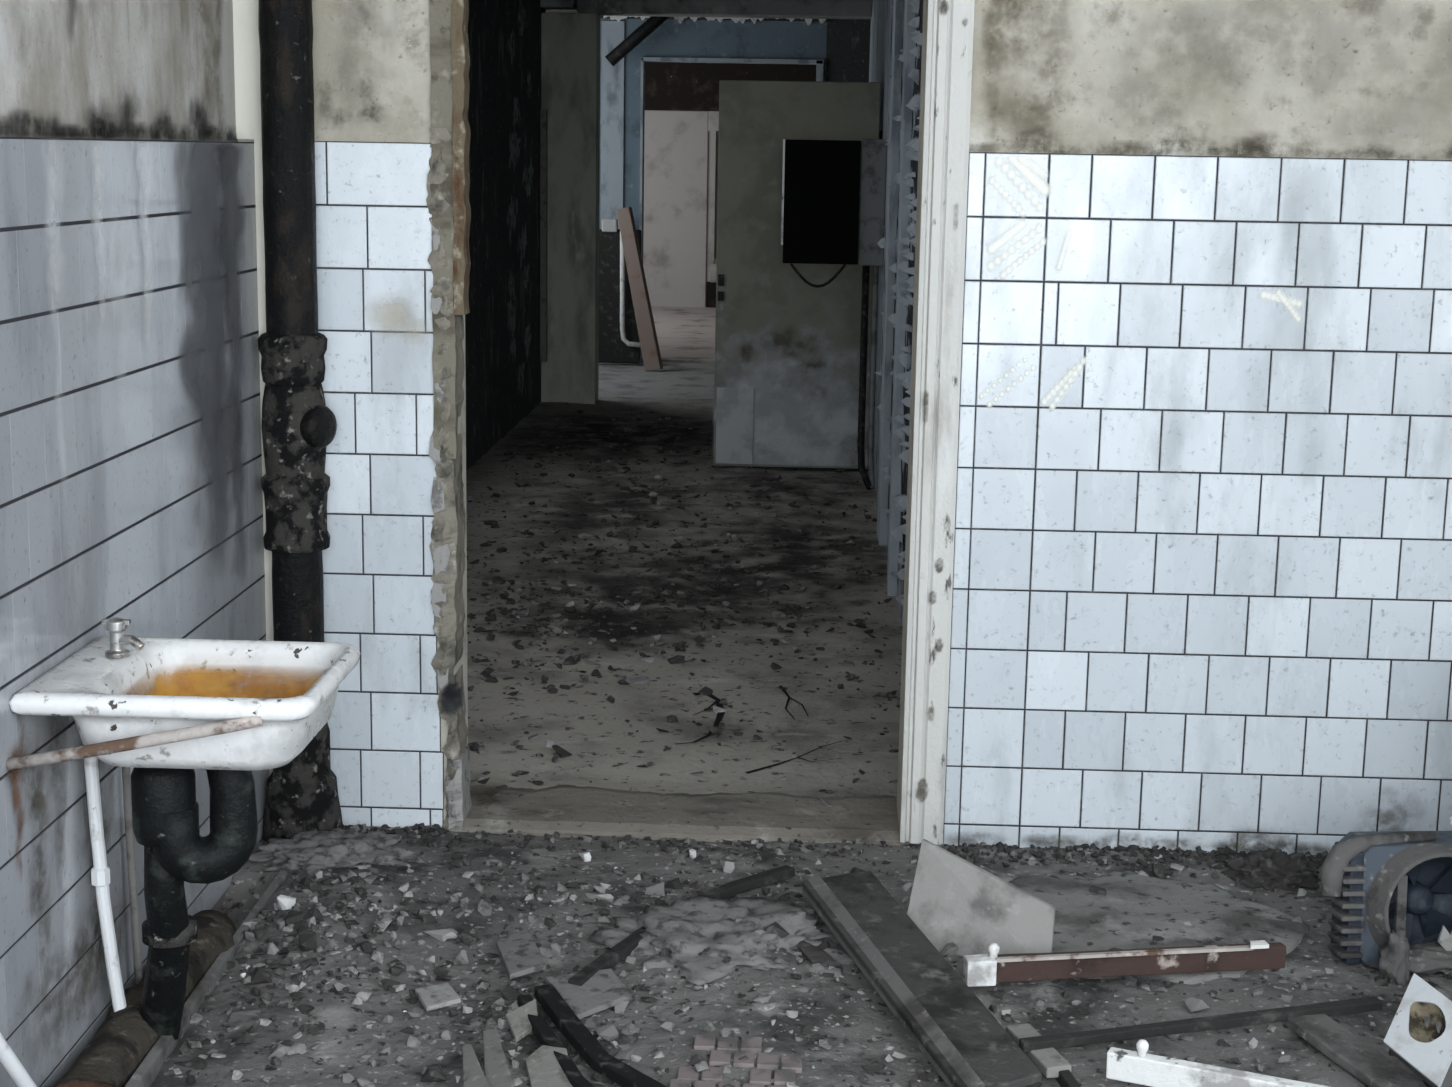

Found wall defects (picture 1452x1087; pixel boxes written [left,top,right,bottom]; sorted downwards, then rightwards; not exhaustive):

leakage [0,91,243,547]
flaking render [426,128,472,831]
peeling [507,70,534,397]
flaking render [674,17,826,25]
peeling [726,0,947,606]
leakage [1210,139,1264,157]
peeling [917,779,927,801]